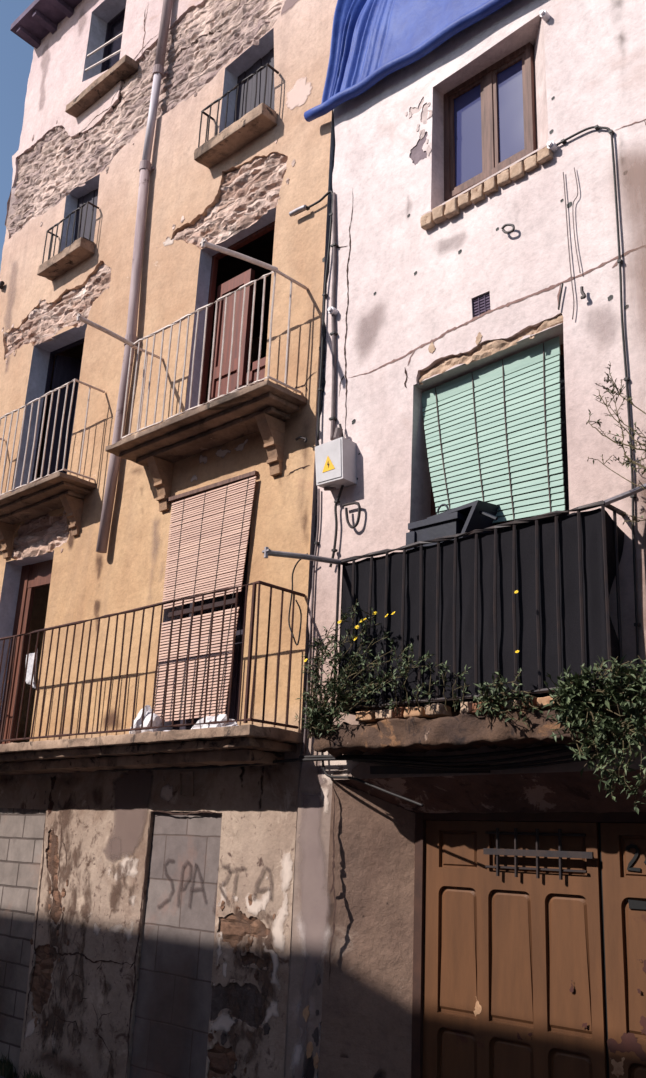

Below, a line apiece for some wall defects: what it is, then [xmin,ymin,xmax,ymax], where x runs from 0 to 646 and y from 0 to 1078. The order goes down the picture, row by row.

flaking render [5,0,283,239]
flaking render [166,139,296,249]
flaking render [405,97,433,165]
flaking render [2,260,111,363]
crack [337,189,638,438]
flaking render [28,829,69,1028]
crack [23,810,222,1078]
flaking render [206,877,279,1078]